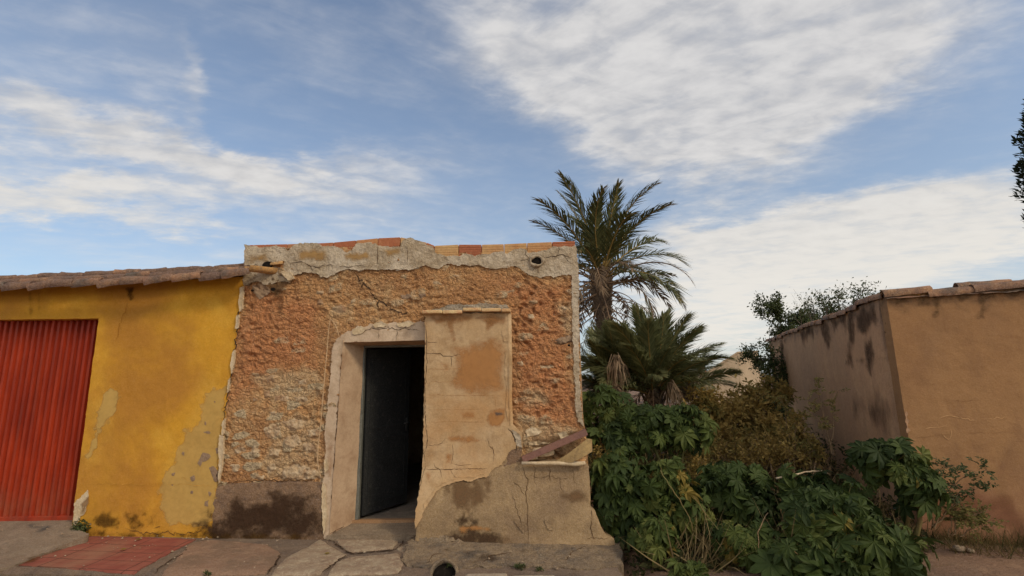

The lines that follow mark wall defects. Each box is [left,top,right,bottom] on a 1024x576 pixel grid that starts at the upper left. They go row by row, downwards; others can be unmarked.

flaking render [287,262,427,278]
flaking render [235,287,245,329]
leakage [800,308,882,371]
peeling [85,388,118,458]
peeling [159,350,329,534]
crack [293,248,580,560]
flaking render [504,427,569,466]
leakage [198,492,322,539]